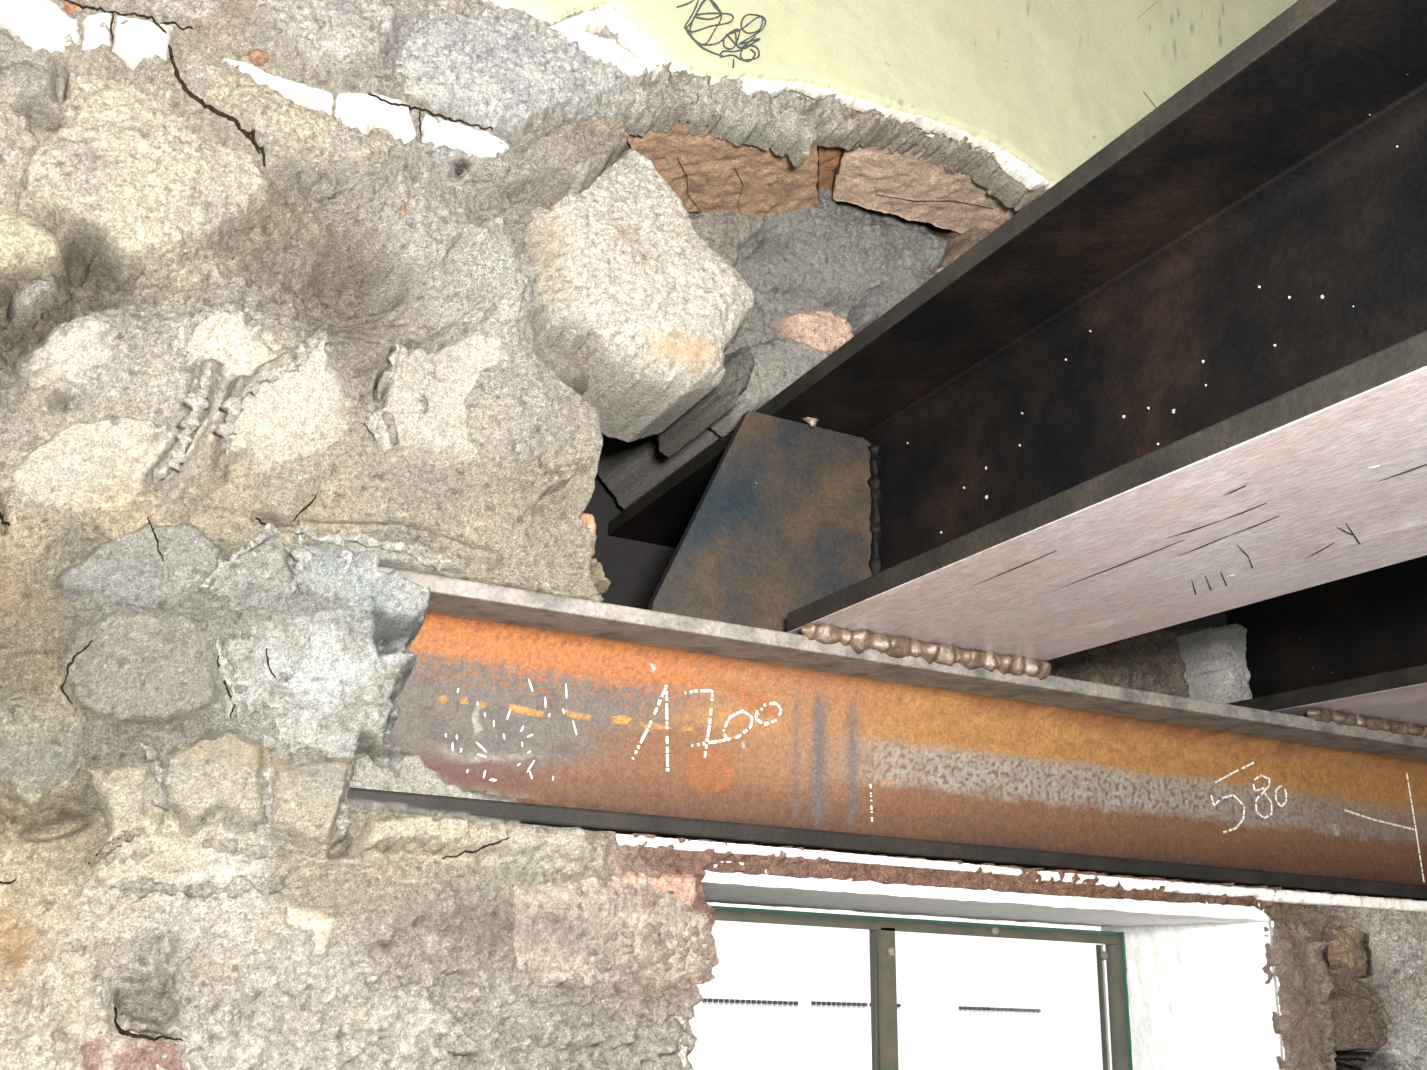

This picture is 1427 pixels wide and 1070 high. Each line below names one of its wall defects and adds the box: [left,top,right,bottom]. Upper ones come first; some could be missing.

crack [59,0,266,167]
crack [368,93,493,140]
spalling [549,6,1054,211]
crack [0,511,11,526]
corrosion [509,704,543,717]
corrosion [612,715,693,731]
crack [1334,1058,1366,1070]